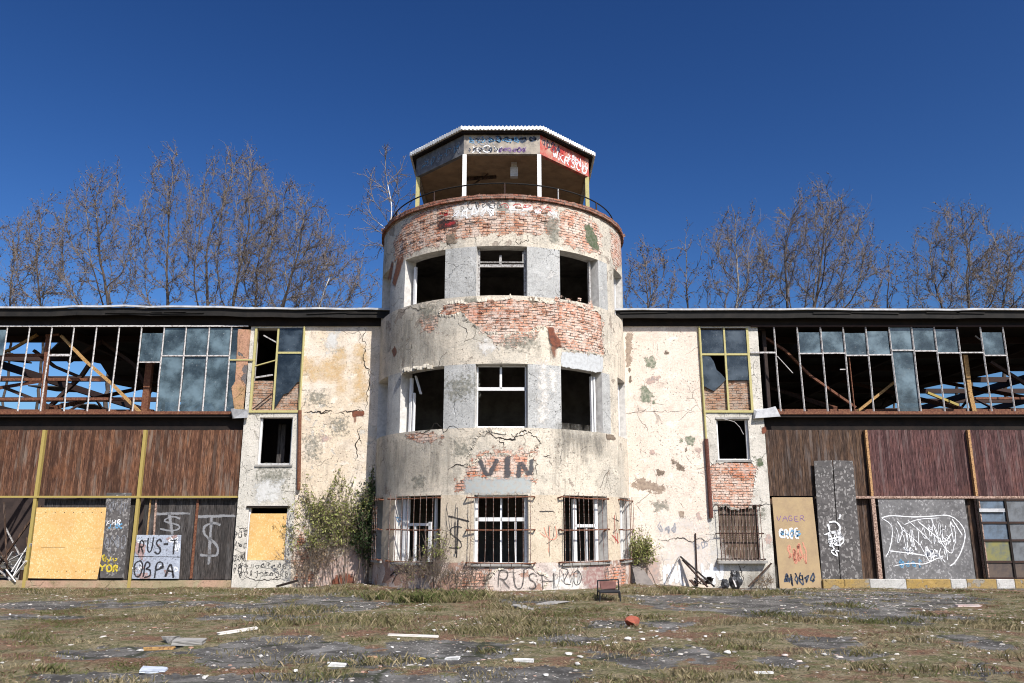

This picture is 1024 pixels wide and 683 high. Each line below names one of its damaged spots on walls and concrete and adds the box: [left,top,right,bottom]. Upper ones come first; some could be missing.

spalling [393,193,622,271]
spalling [419,294,606,358]
crack [305,328,370,460]
crack [404,423,552,473]
peeling [453,359,557,493]
spalling [625,332,669,404]
peeling [632,459,702,520]
peeling [705,459,759,511]